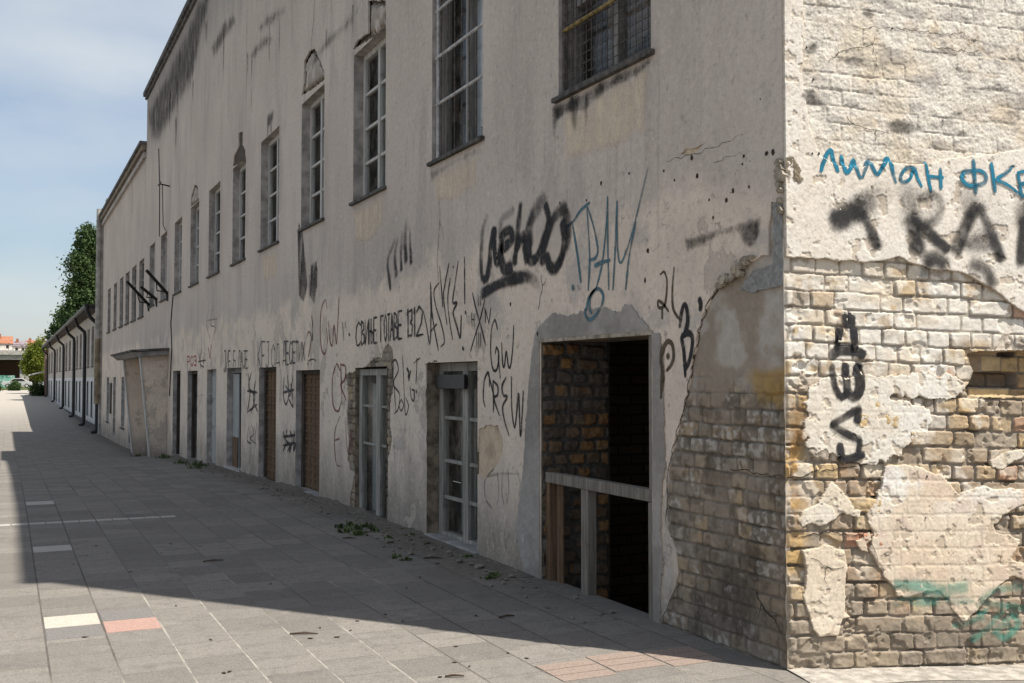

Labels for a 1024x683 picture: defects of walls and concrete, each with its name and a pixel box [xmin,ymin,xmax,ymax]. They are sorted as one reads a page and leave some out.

water stain [149,2,207,135]
water stain [553,63,647,123]
crack [666,134,745,163]
flaking render [346,345,394,511]
flaking render [663,149,1024,669]